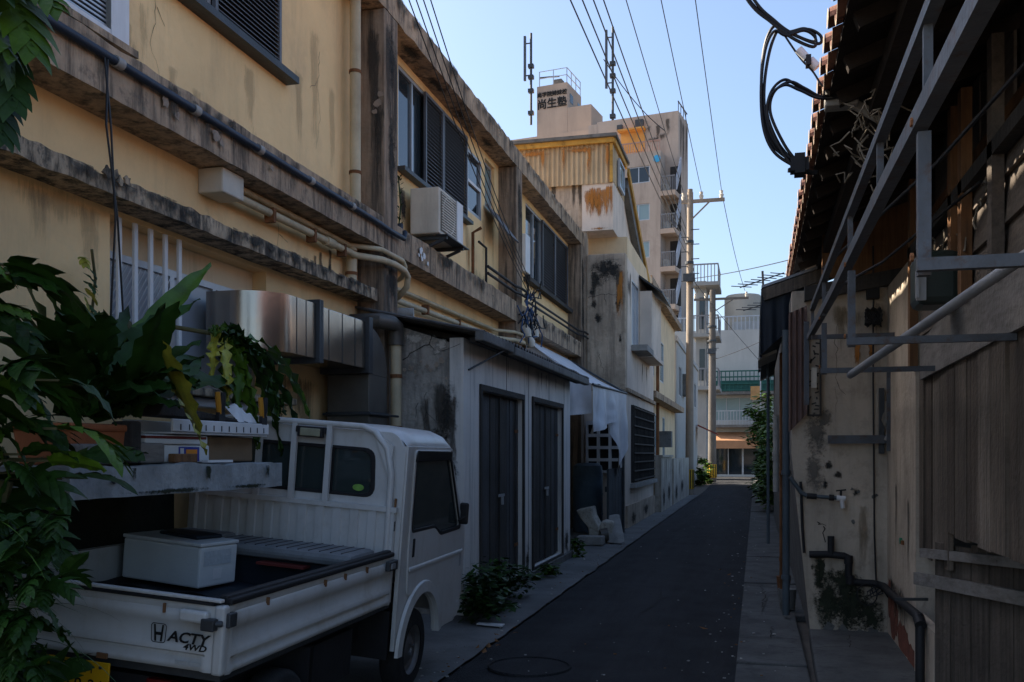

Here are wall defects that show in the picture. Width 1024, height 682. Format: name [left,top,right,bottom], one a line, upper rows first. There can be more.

damp [74,161,98,179]
damp [115,178,194,217]
corrosion [585,186,613,215]
damp [233,227,371,291]
damp [545,259,631,347]
damp [422,385,458,477]
mould [811,558,905,631]